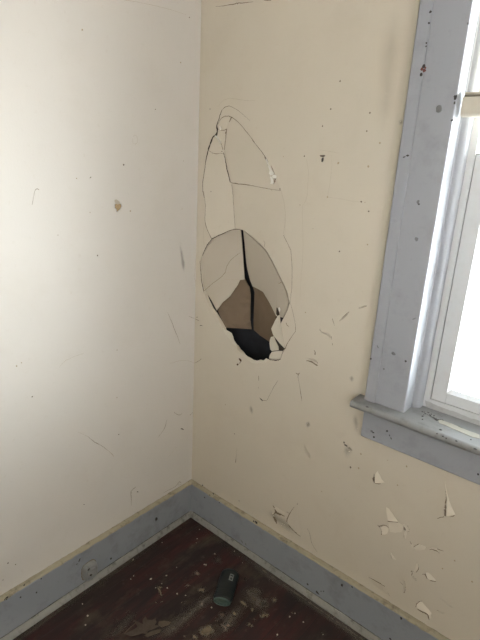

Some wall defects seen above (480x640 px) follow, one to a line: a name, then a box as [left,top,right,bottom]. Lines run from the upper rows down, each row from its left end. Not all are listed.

spalling [200,117,293,364]
crack [202,106,292,261]